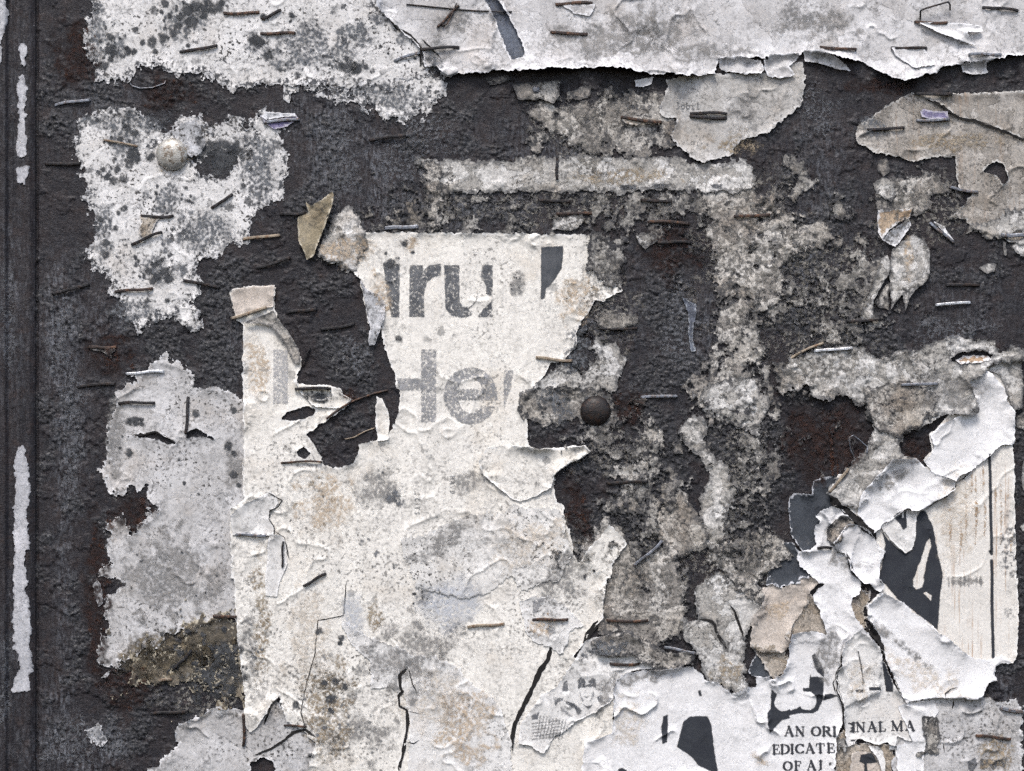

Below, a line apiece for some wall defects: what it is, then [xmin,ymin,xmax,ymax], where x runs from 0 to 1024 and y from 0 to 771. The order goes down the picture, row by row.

rust [781,404,864,484]
water stain [119,520,286,717]
crack [397,668,420,771]
crack [510,648,552,753]